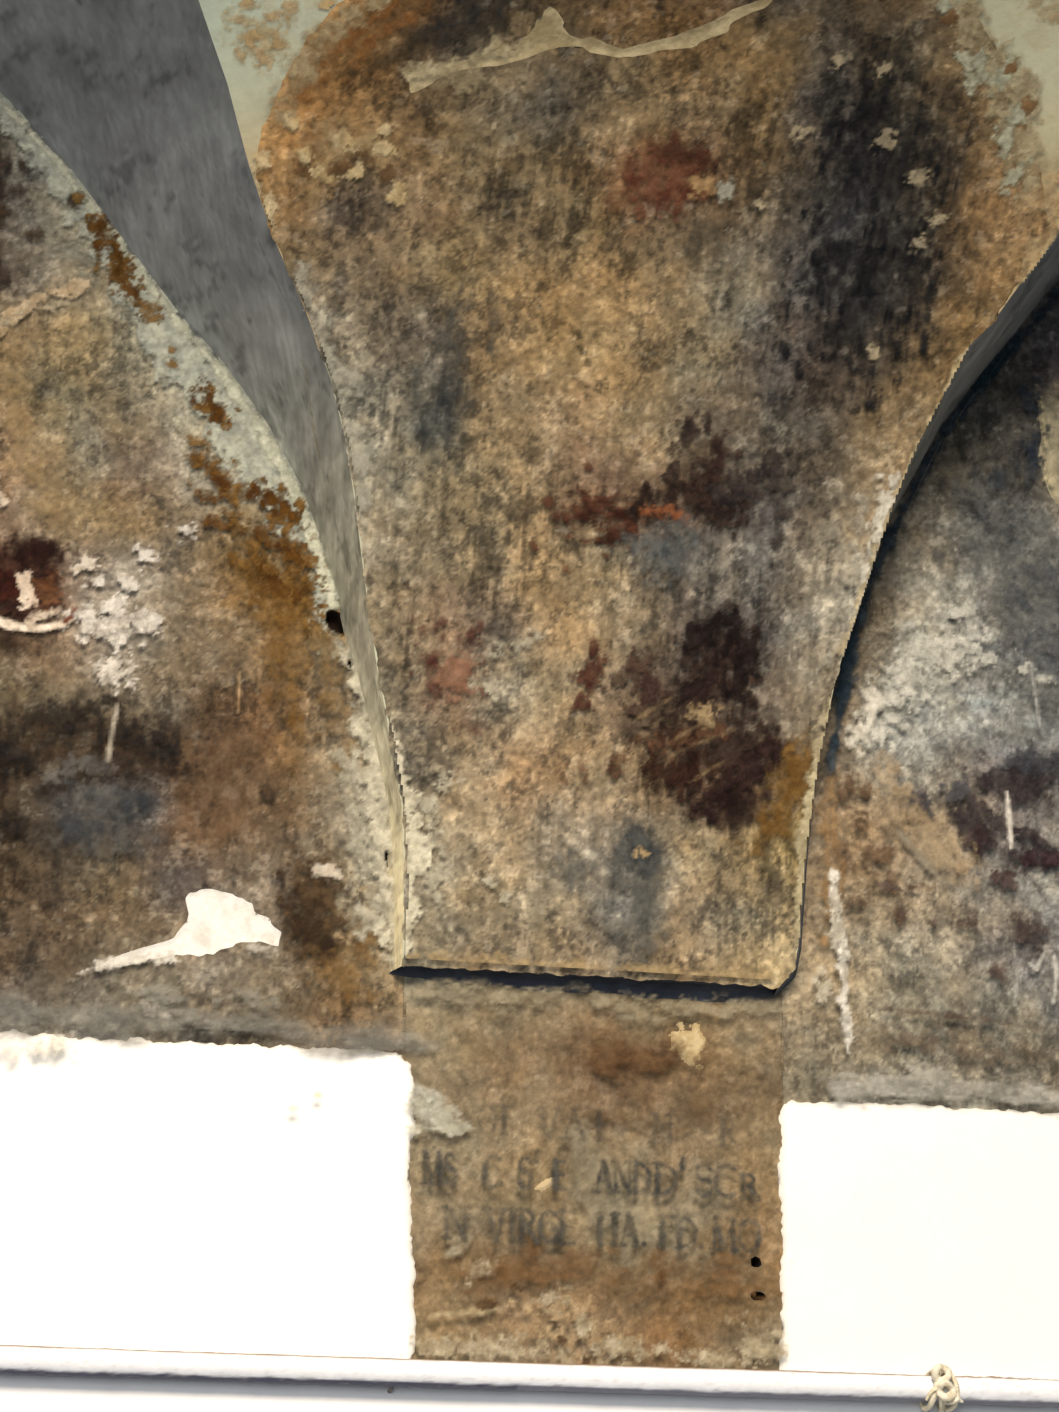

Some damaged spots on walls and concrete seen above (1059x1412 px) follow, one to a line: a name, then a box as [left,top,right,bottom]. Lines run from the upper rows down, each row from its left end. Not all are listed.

flaking render [402,0,772,93]
water stain [756,33,960,409]
rust [167,346,328,735]
water stain [0,530,275,856]
flaking render [81,889,281,973]
water stain [568,602,814,856]
water stain [897,745,1059,890]